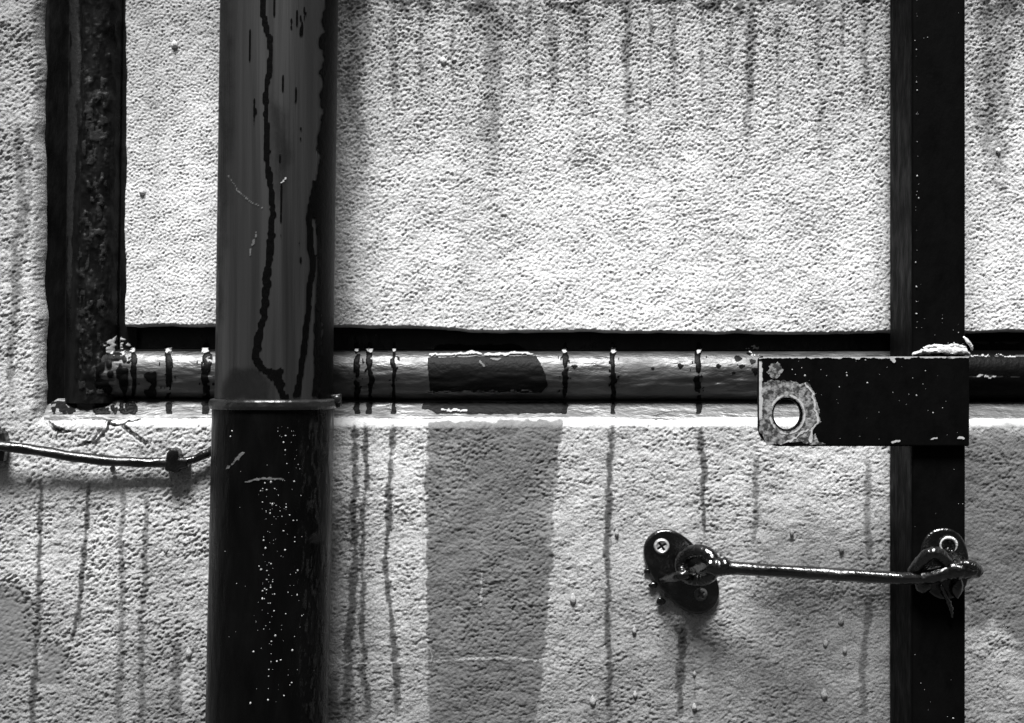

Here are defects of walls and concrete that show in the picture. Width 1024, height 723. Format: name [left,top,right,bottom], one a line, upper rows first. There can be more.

leakage [389,342,400,414]
leakage [609,342,620,413]
leakage [690,342,707,414]
leakage [71,487,90,638]
leakage [340,342,375,711]
leakage [382,430,401,711]
leakage [423,342,571,723]
leakage [603,427,615,706]
leakage [697,428,708,530]
leakage [29,661,38,723]
leakage [675,623,687,713]